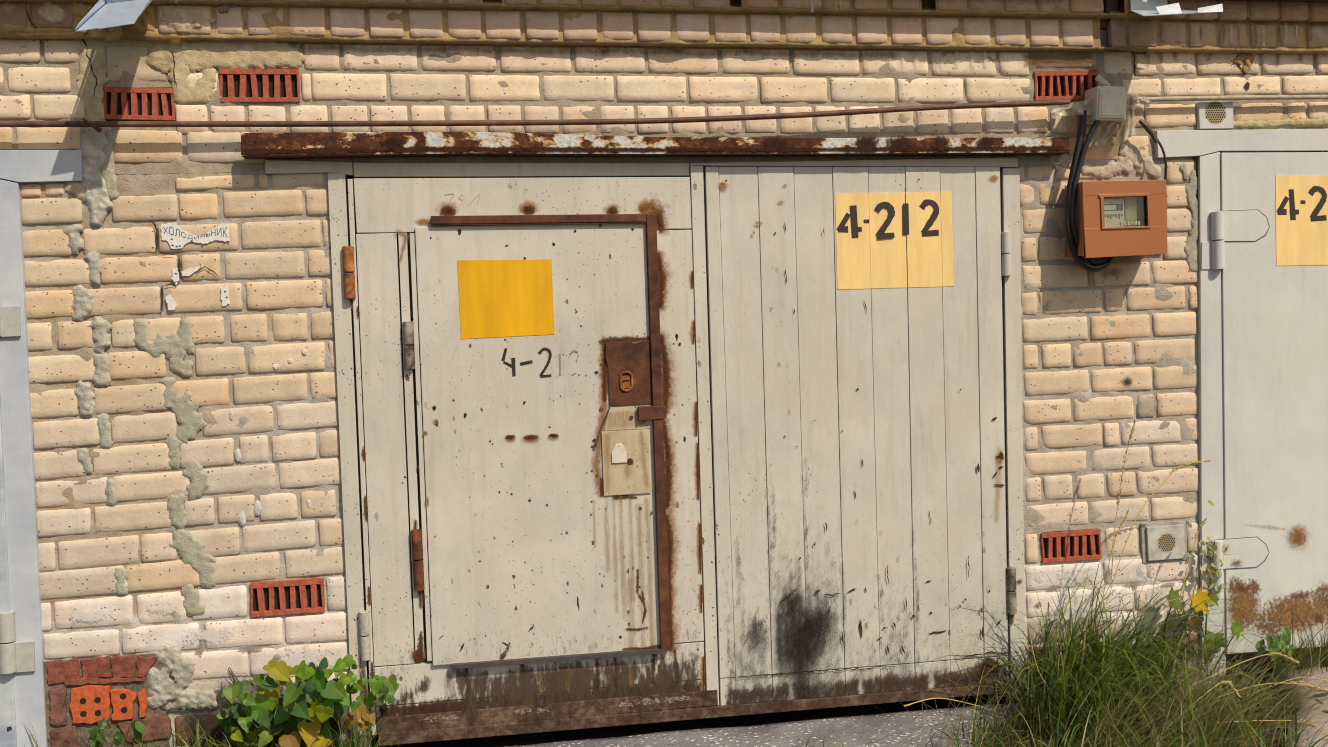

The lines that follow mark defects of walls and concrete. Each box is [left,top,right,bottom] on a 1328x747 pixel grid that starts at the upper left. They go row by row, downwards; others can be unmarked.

corrosion [242,135,1064,155]
corrosion [639,200,665,233]
corrosion [658,252,669,309]
corrosion [360,320,705,717]
corrosion [1290,527,1308,548]
leakage [727,518,983,700]
corrosion [1224,546,1328,637]
peeling [182,627,333,675]